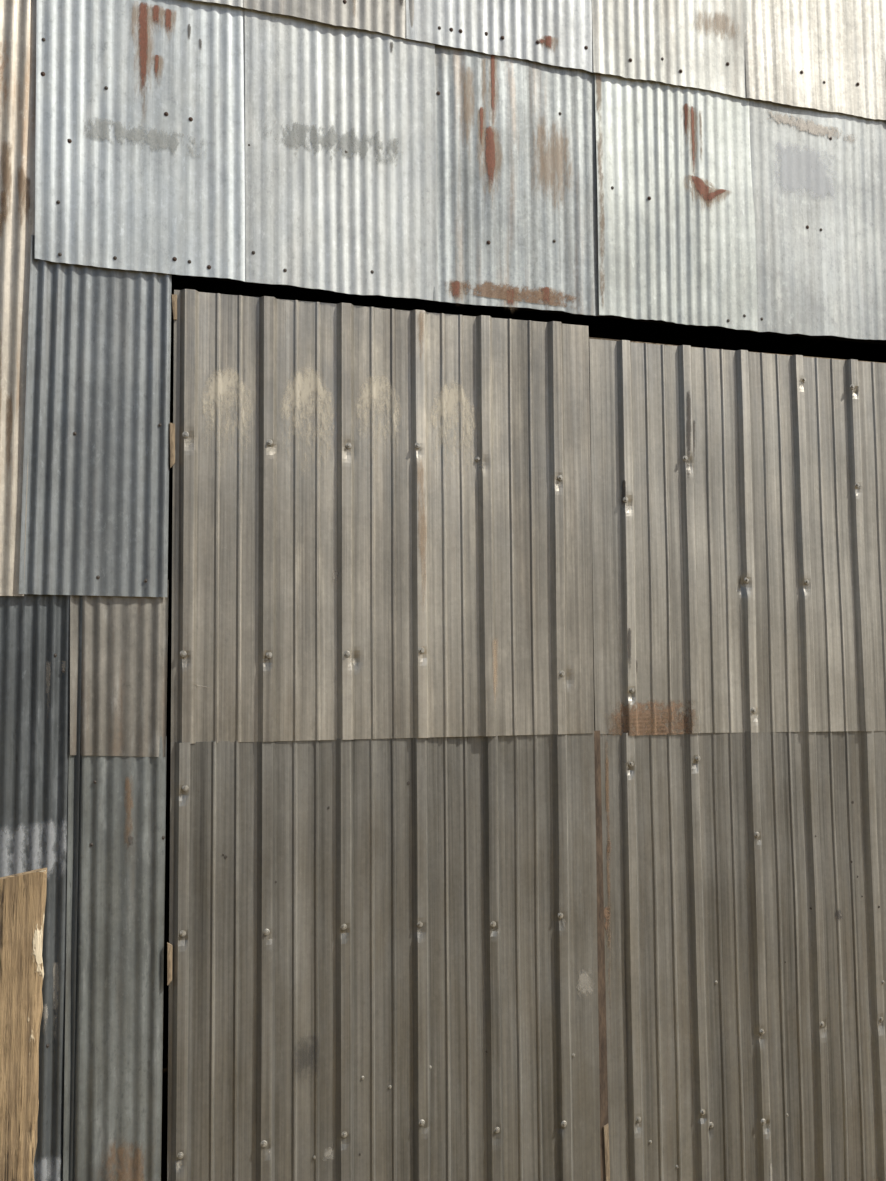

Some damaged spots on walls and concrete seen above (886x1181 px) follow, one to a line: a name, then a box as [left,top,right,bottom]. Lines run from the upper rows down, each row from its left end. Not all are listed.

rust [139,3,171,86]
rust [480,55,495,182]
rust [684,103,726,200]
rust [451,281,576,307]
rust [612,702,694,736]